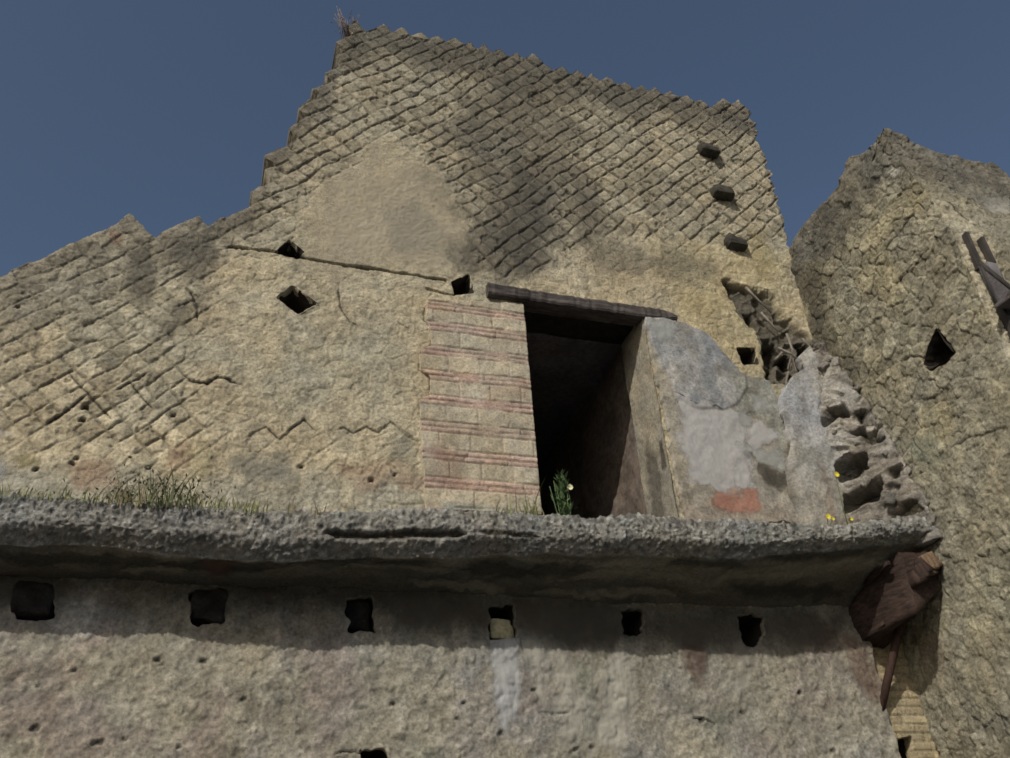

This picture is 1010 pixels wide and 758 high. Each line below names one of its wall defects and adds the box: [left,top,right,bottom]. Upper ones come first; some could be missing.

crack [184,376,236,385]
crack [255,419,313,440]
crack [341,421,396,433]
flaking render [642,317,800,524]
leakage [0,546,877,747]